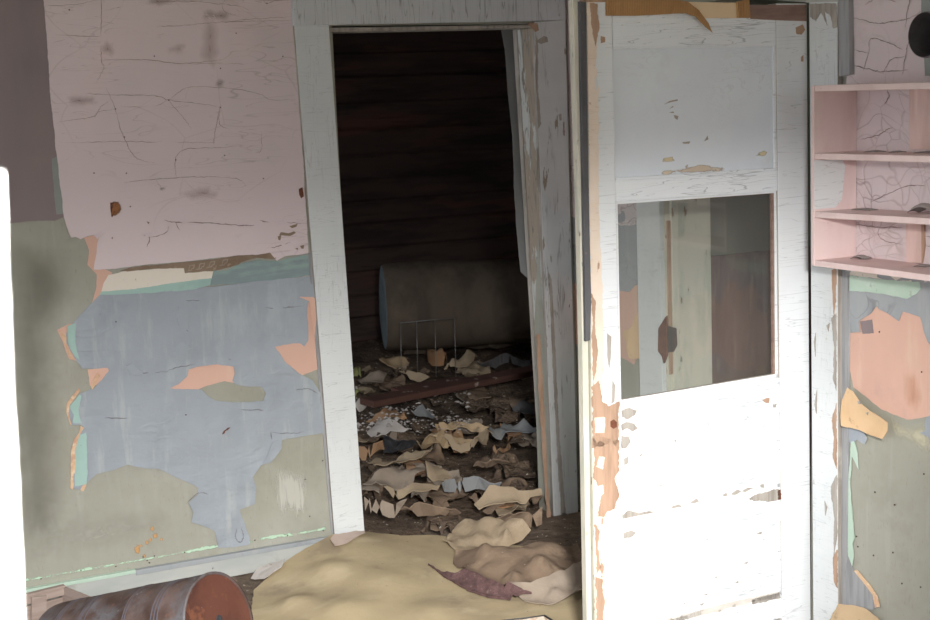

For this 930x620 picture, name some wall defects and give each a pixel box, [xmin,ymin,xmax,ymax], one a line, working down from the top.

crack [51,0,290,187]
crack [854,0,921,105]
peeling [846,0,930,267]
peeling [0,0,323,548]
crack [147,220,301,248]
peeling [559,0,655,620]
crack [856,224,902,245]
peeling [723,484,781,502]
peeling [824,269,930,610]
peeling [662,592,781,620]